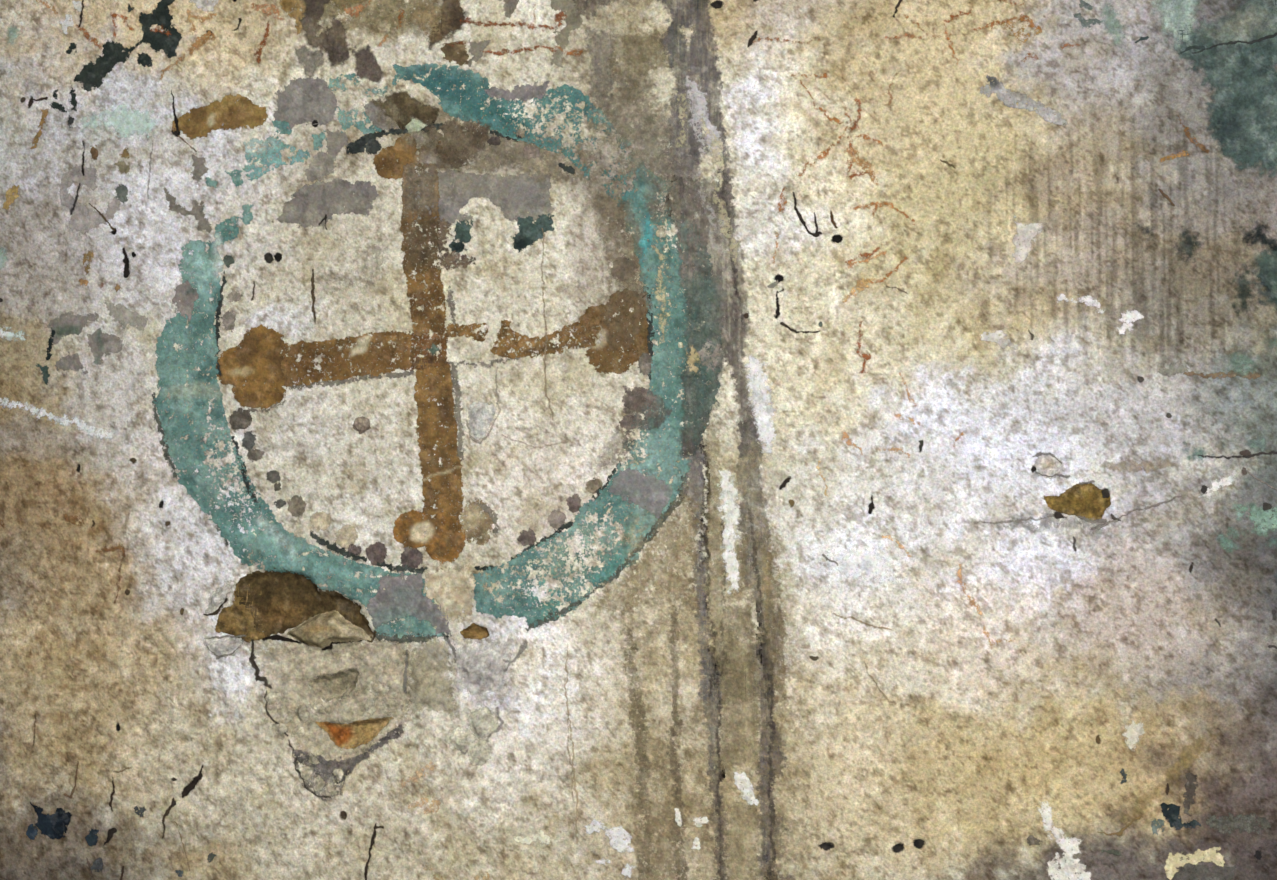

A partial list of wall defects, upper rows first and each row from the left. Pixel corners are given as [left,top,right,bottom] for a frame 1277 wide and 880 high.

leakage [296,0,466,82]
crack [1181,33,1277,54]
leakage [372,0,789,880]